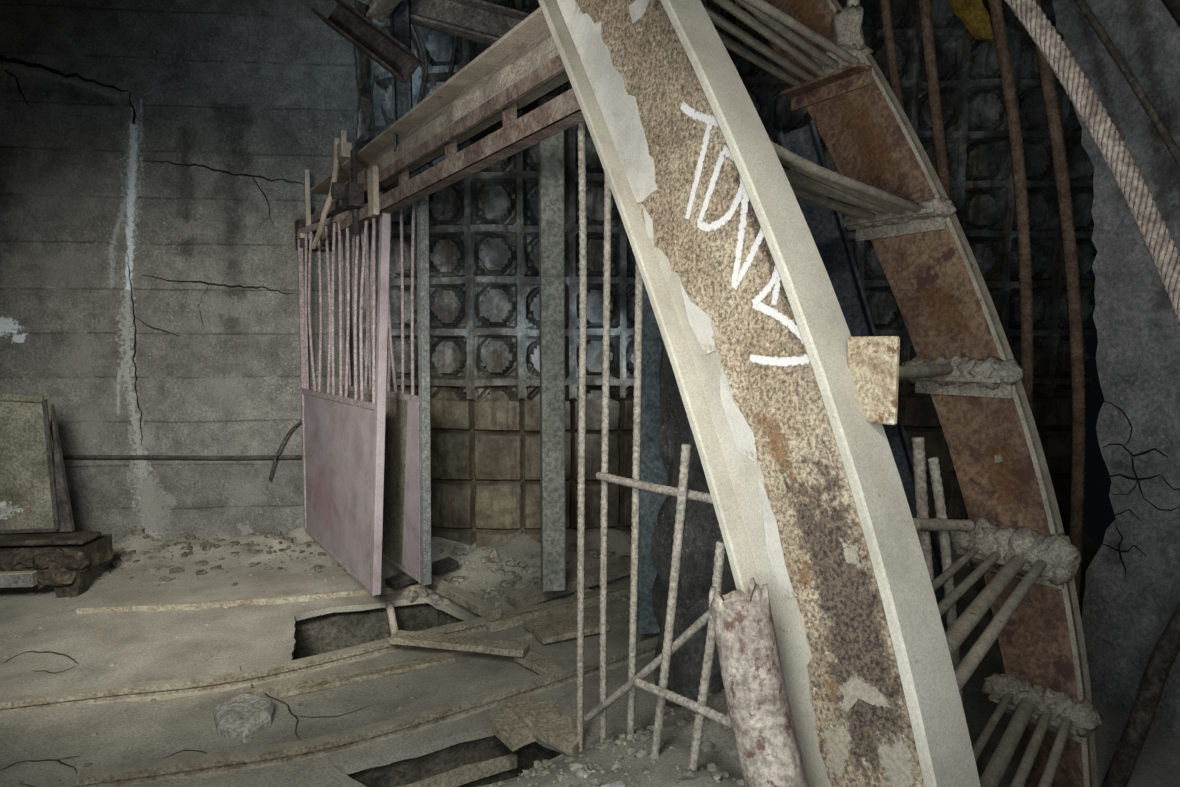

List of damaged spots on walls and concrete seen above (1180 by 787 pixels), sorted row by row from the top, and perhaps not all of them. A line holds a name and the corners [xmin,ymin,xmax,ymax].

crack [0,55,312,224]
damp [108,98,164,538]
peeling [556,0,892,787]
corrosion [747,199,790,306]
crack [1101,400,1180,577]
spalling [293,603,464,660]
corrosion [757,417,906,784]
spalling [348,735,561,787]